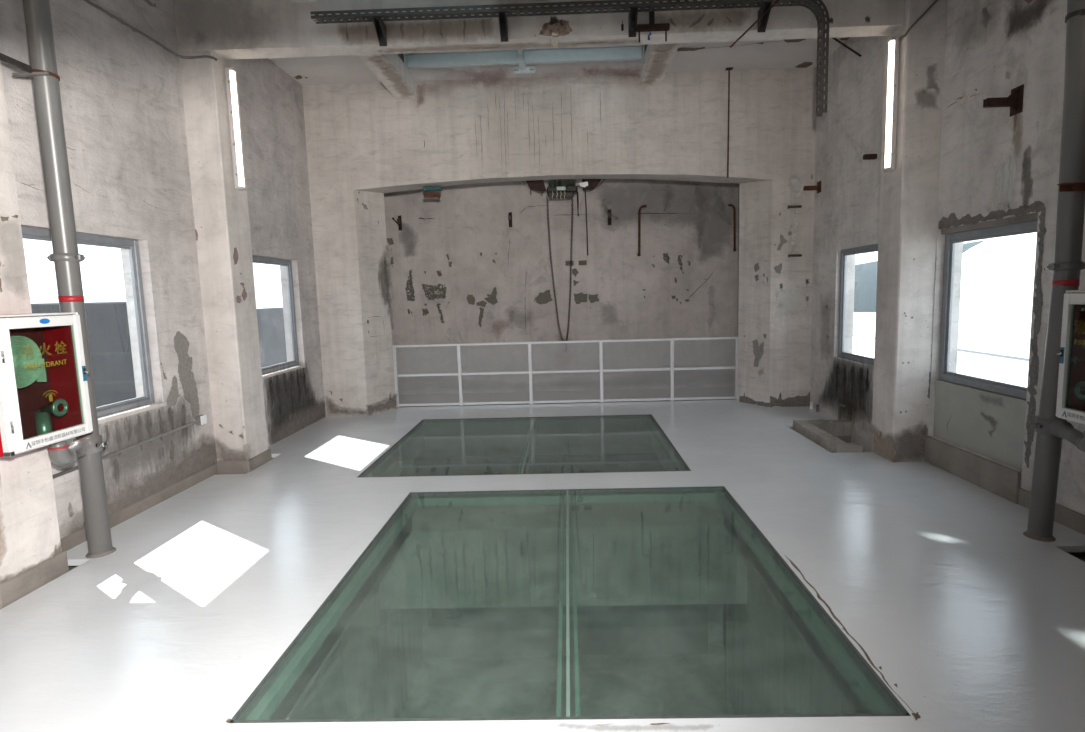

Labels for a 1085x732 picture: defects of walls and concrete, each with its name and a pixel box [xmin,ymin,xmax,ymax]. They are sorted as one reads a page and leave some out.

water stain [1008,0,1048,37]
peeling [405,254,452,323]
peeling [467,287,498,327]
peeling [534,290,552,304]
peeling [572,268,599,309]
water stain [267,365,735,444]
water stain [739,359,926,461]